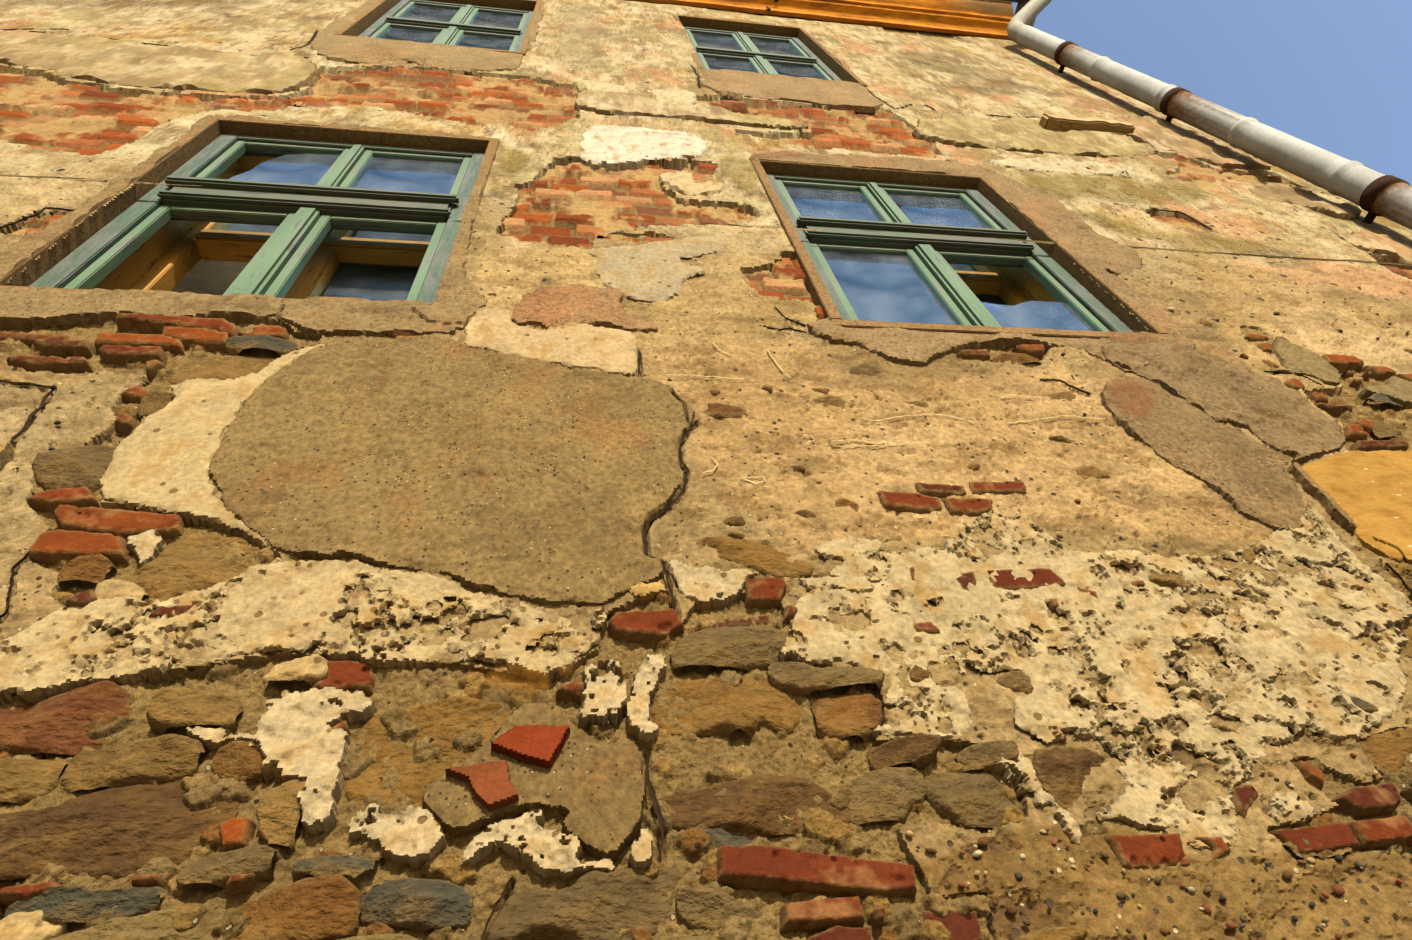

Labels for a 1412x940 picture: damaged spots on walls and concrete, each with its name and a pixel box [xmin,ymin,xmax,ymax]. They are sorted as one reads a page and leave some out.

flaking render [0,30,1412,279]
crack [0,380,55,446]
flaking render [0,313,320,618]
crack [635,350,643,377]
crack [643,392,698,610]
crack [1040,379,1090,395]
crack [1264,370,1321,385]
flaking render [1240,327,1412,452]
crack [0,552,29,619]
flaking render [0,516,1108,940]
flaking render [1103,833,1231,869]
flaking render [1267,727,1412,864]